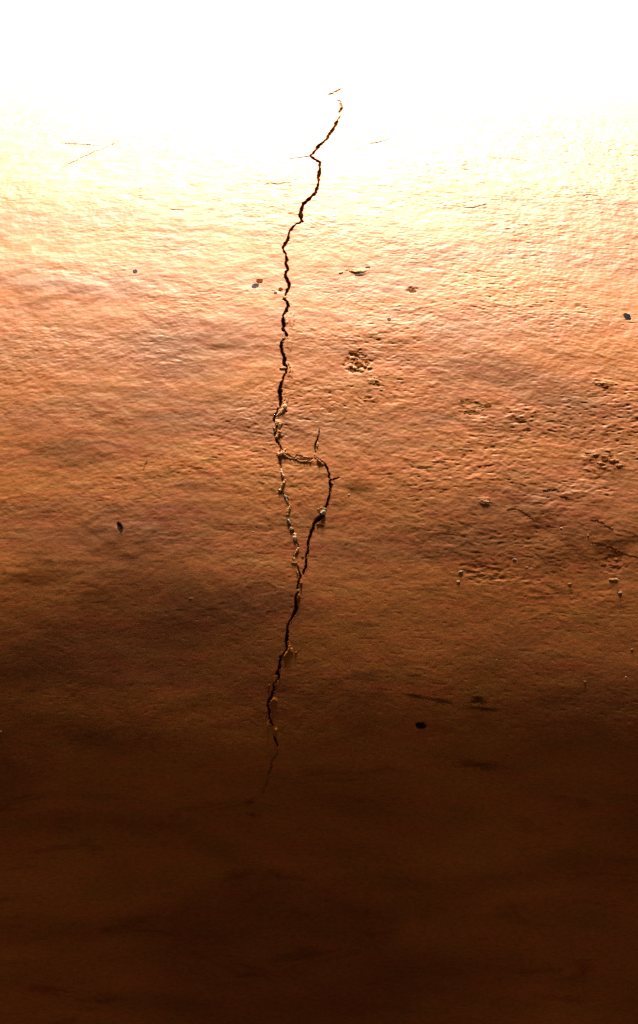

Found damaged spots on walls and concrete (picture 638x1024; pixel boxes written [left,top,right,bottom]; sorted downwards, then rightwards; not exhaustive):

crack [262,88,342,793]